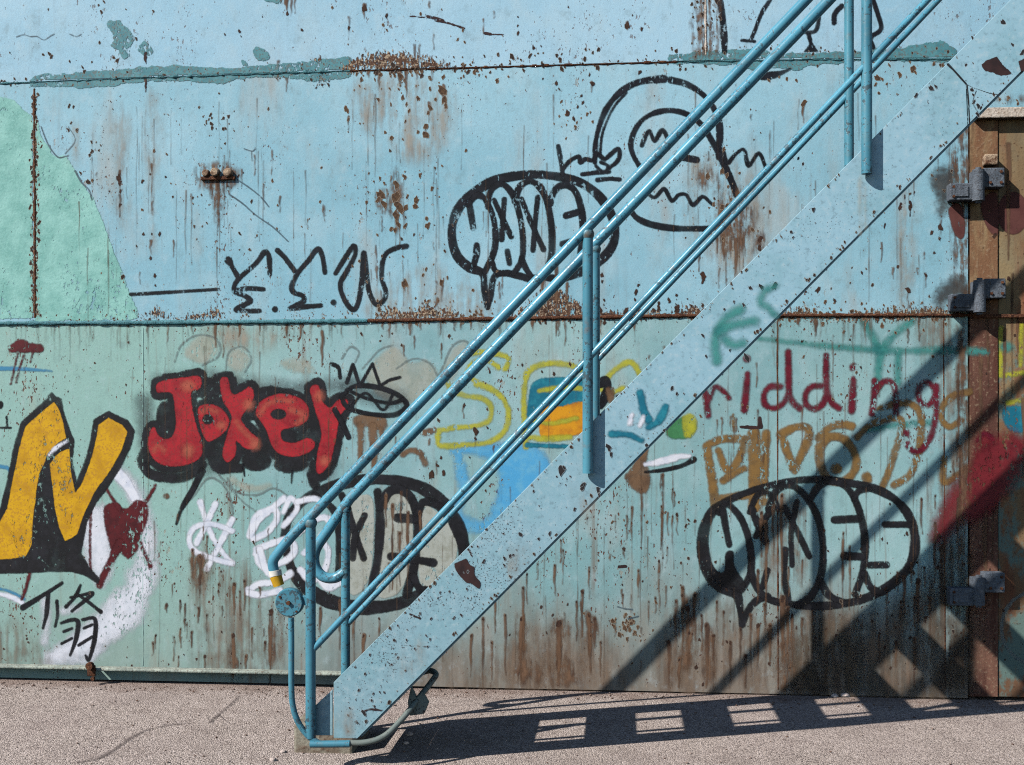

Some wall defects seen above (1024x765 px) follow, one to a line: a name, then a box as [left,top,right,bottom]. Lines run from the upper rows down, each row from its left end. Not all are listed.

peeling [29,20,352,92]
rust [339,30,623,152]
peeling [965,43,1024,76]
rust [0,77,274,346]
rust [284,170,583,362]
rust [600,151,786,332]
rust [1003,273,1019,410]
rust [149,527,281,682]
rust [469,473,827,691]
rust [827,532,862,607]